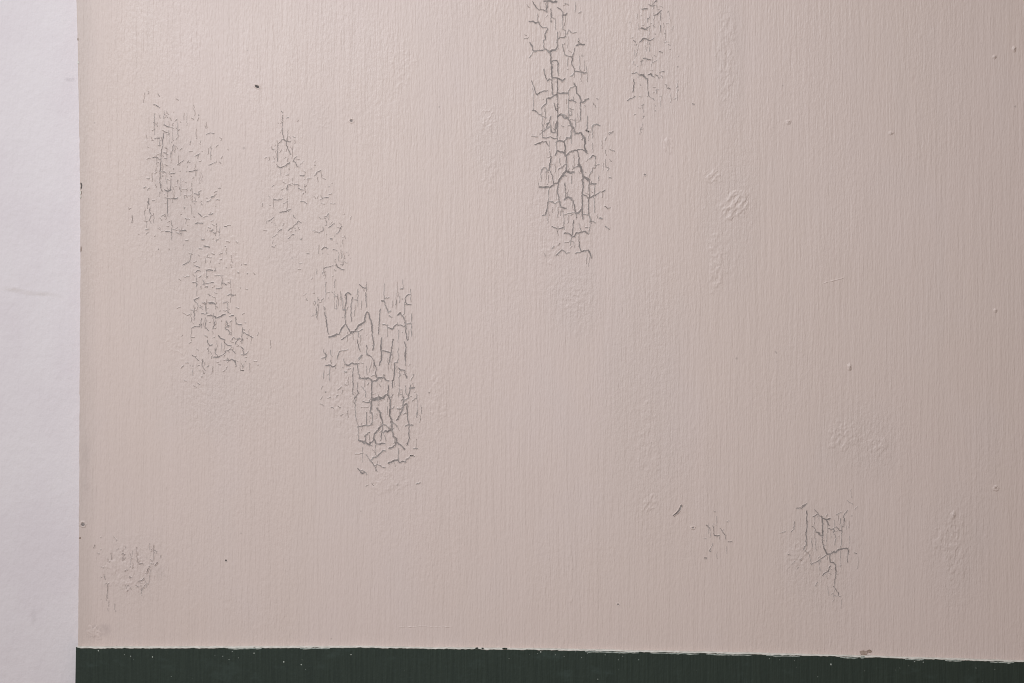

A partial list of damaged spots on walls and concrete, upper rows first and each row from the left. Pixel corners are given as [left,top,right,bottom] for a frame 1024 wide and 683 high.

crack [128,91,272,388]
crack [261,110,430,487]
crack [524,0,615,266]
crack [627,0,695,135]
crack [779,489,859,609]